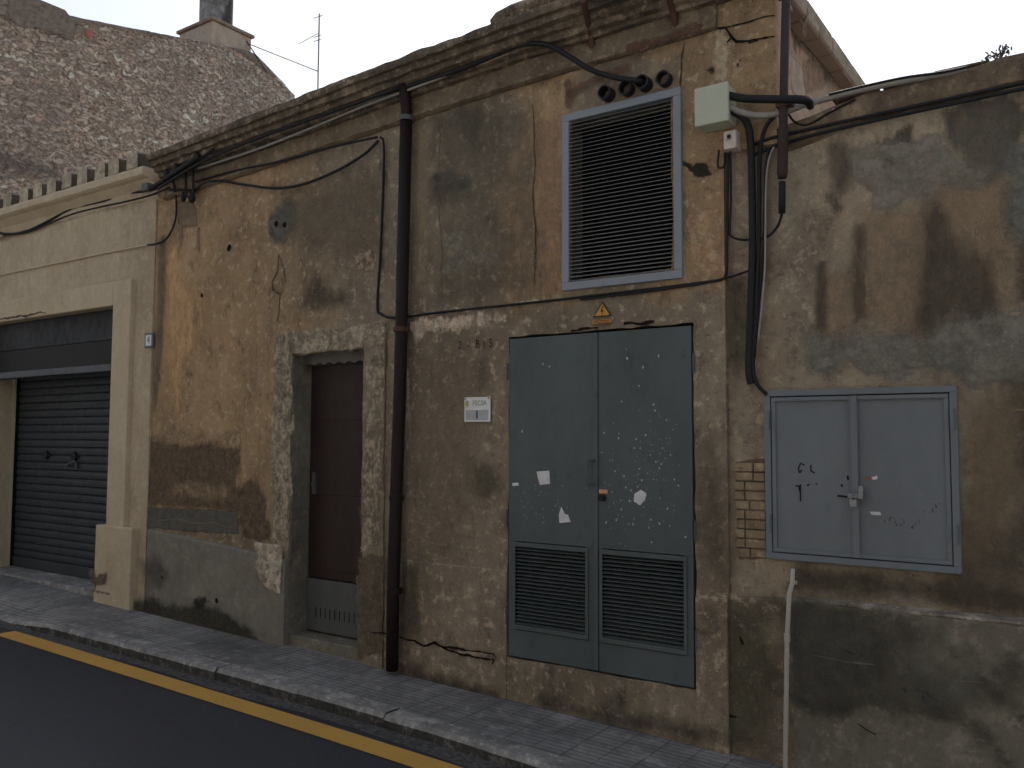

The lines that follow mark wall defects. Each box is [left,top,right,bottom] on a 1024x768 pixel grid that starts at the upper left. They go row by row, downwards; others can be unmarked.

crack [718,15,774,44]
damp [817,95,1024,333]
flaking render [148,321,388,594]
crack [371,632,496,664]
damp [785,506,1024,740]